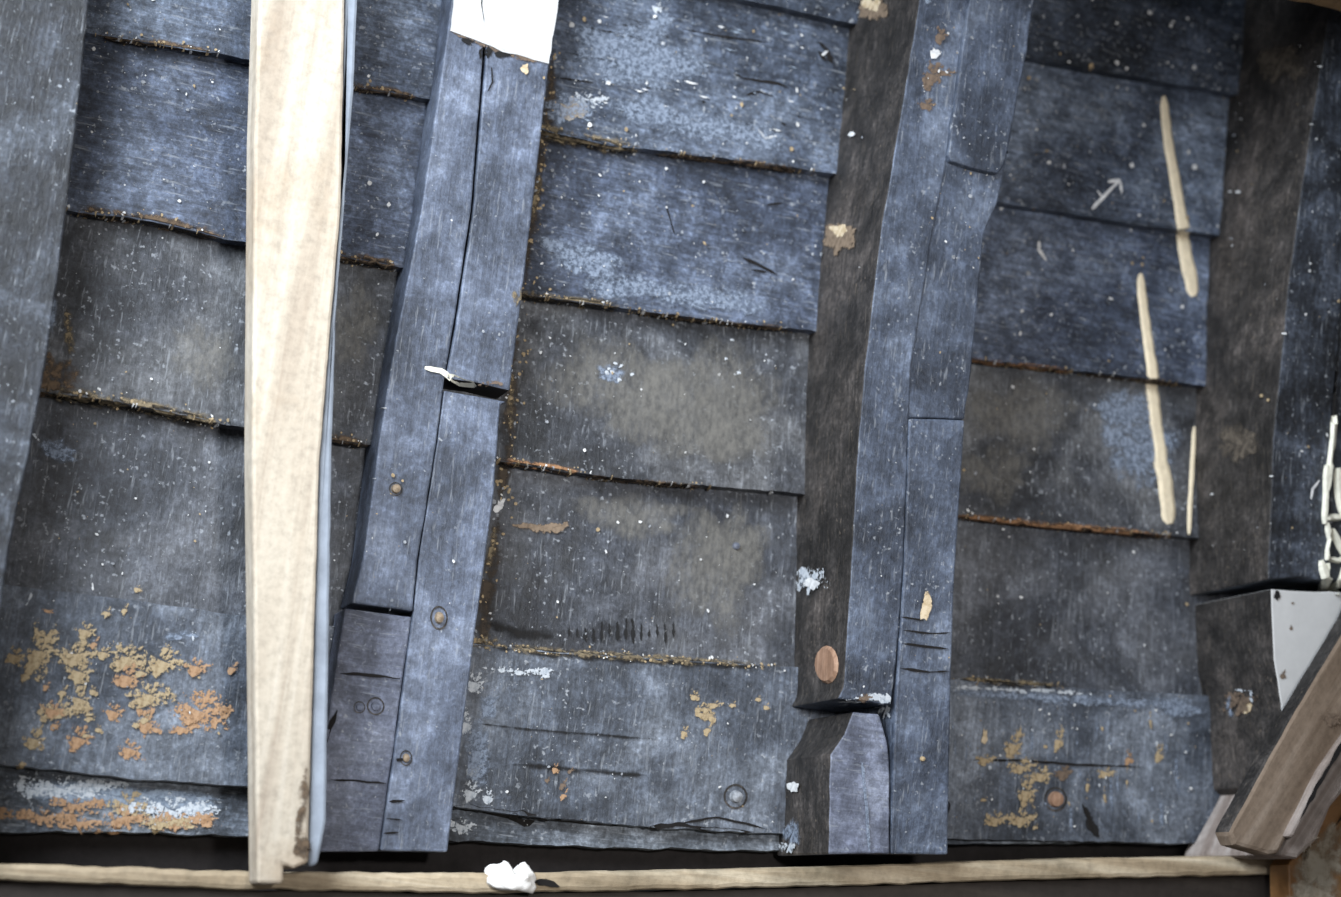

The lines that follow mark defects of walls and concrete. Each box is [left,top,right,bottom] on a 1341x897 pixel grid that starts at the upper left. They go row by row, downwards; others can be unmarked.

corrosion [95,32,220,58]
corrosion [354,83,415,102]
corrosion [66,205,225,239]
corrosion [340,250,396,272]
corrosion [40,300,229,429]
corrosion [473,52,817,671]
corrosion [332,432,365,449]
corrosion [958,512,1178,540]